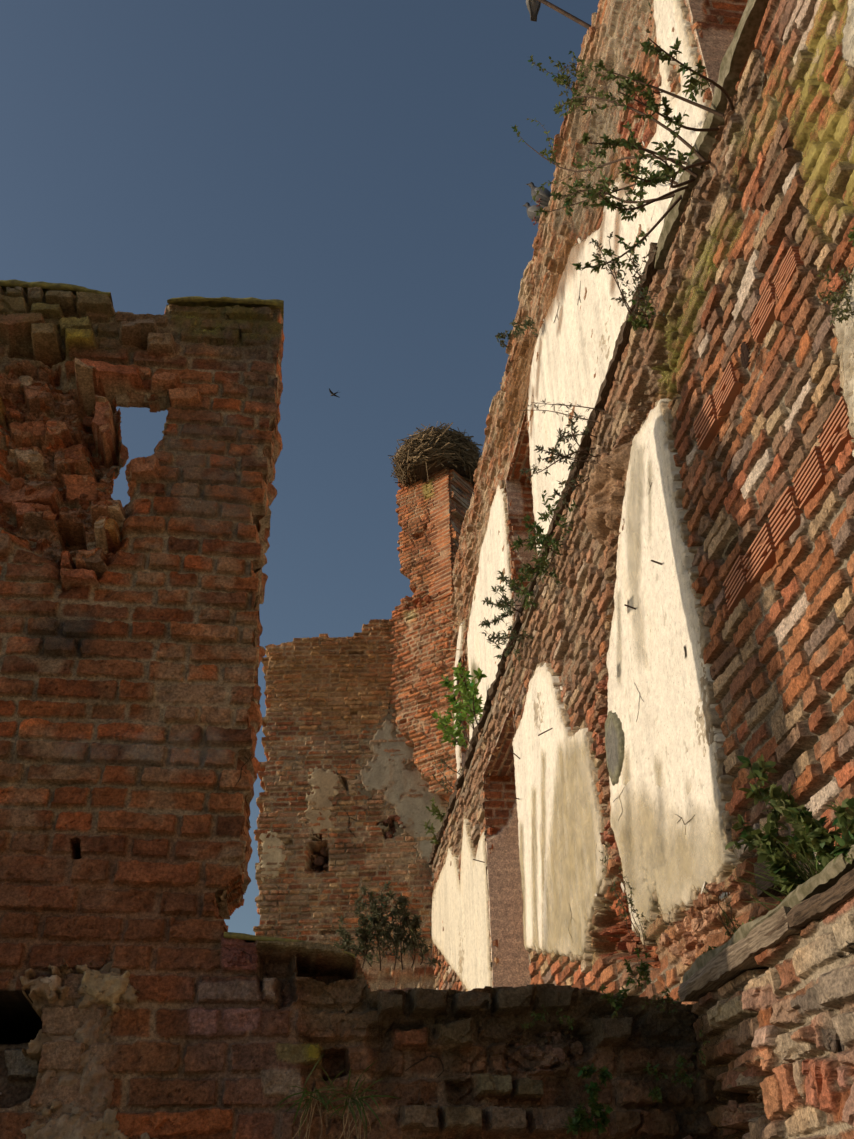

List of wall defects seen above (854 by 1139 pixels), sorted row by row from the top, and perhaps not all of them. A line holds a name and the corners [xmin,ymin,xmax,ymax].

spalling [0,358,132,572]
flaking render [302,702,495,991]
flaking render [20,946,155,1139]